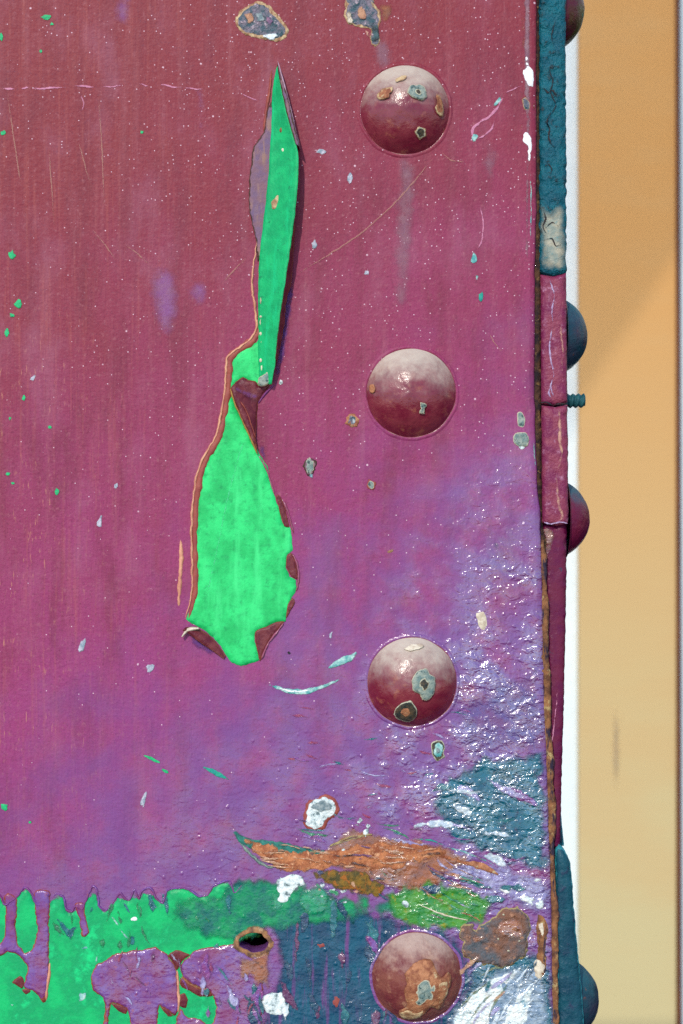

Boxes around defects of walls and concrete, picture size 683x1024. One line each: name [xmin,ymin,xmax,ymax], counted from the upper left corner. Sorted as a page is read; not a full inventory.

peeling [235,1,289,42]
peeling [344,0,381,47]
peeling [177,63,300,666]
peeling [303,794,340,830]
peeling [277,874,305,903]
corrosion [234,824,531,969]
peeling [0,880,289,1024]